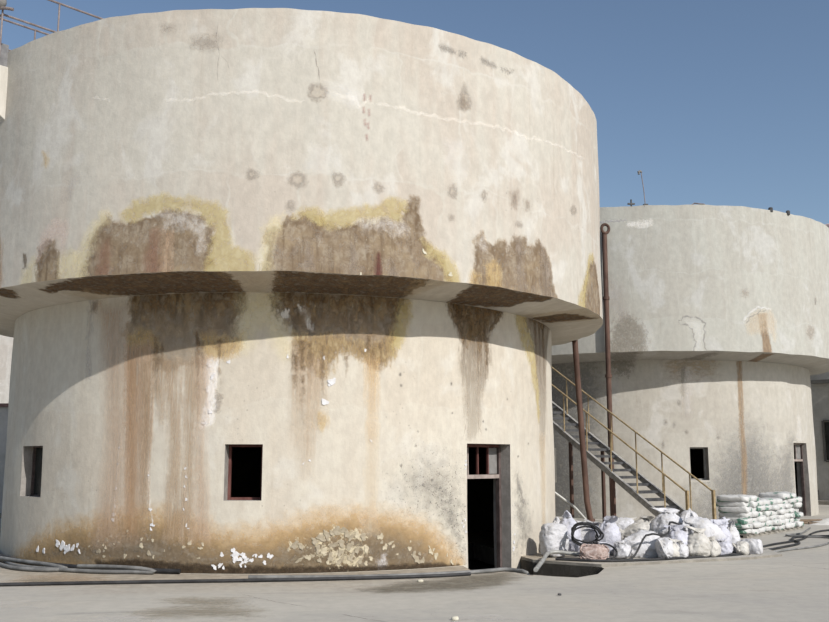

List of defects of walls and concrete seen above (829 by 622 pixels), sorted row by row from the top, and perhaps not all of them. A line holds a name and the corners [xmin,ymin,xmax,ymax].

damp [448,232,557,374]
damp [610,316,646,374]
damp [20,195,461,574]
rust [736,311,772,495]
peeling [287,524,398,566]
peeling [407,540,454,565]
damp [380,573,515,592]